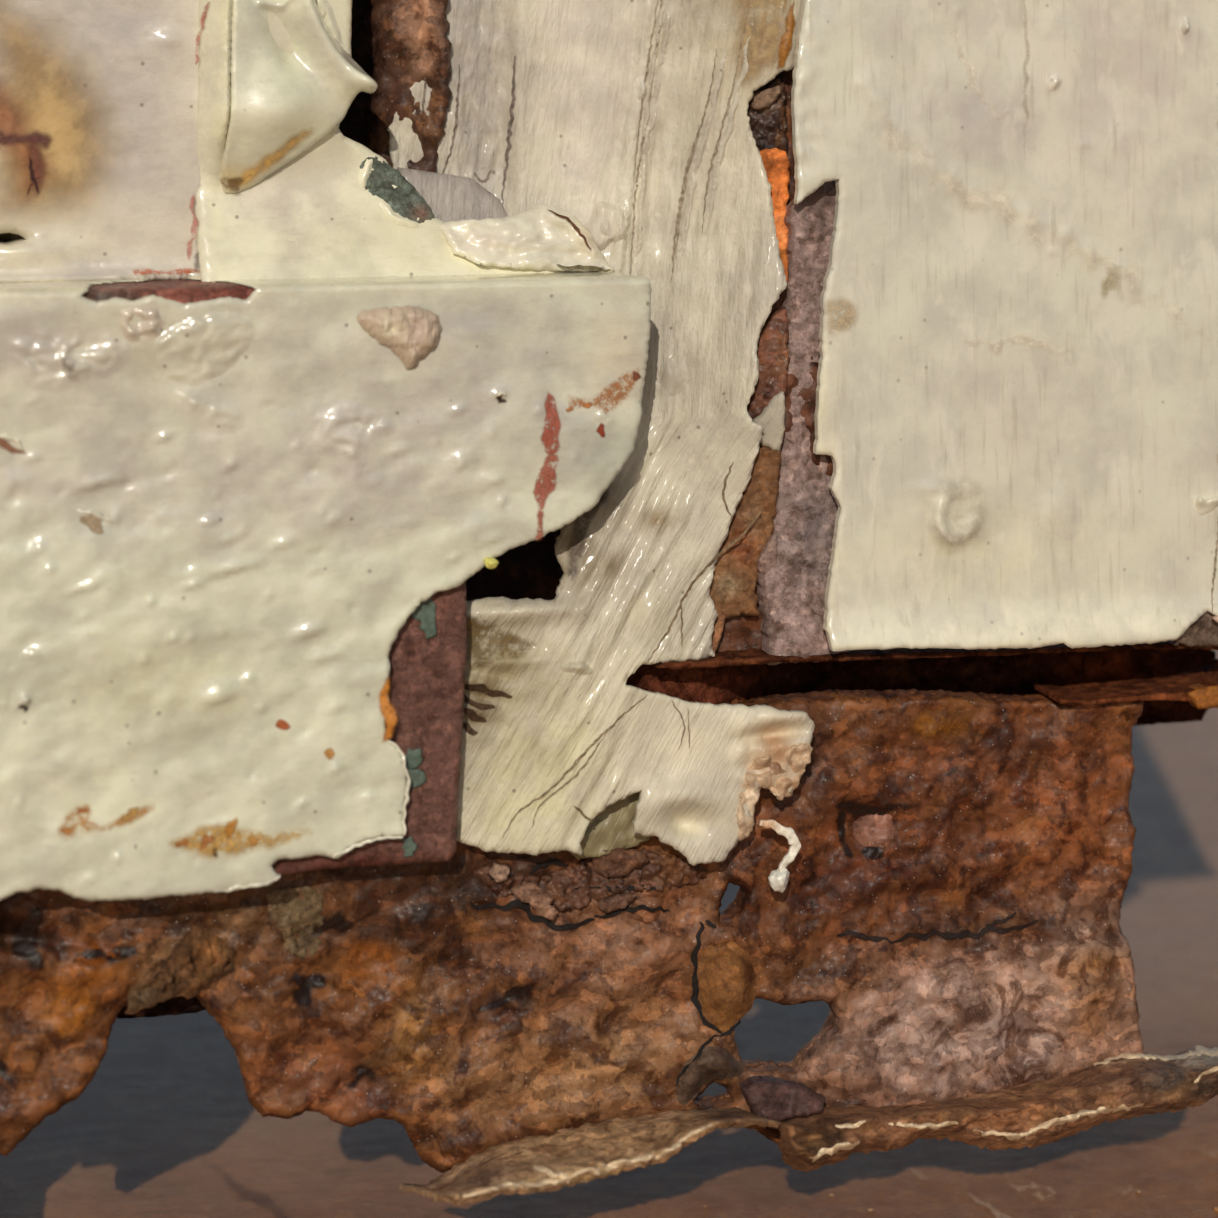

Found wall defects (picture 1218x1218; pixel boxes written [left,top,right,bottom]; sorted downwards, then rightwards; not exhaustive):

rust [0,28,97,203]
rust [364,0,452,172]
peeling [81,279,255,304]
rust [687,0,833,669]
rust [534,371,641,539]
peeling [77,509,113,534]
crack [1195,496,1218,613]
rust [114,806,151,825]
rust [175,819,300,857]
spalling [214,874,280,893]
spalling [333,739,411,858]
peeling [739,1075,826,1122]